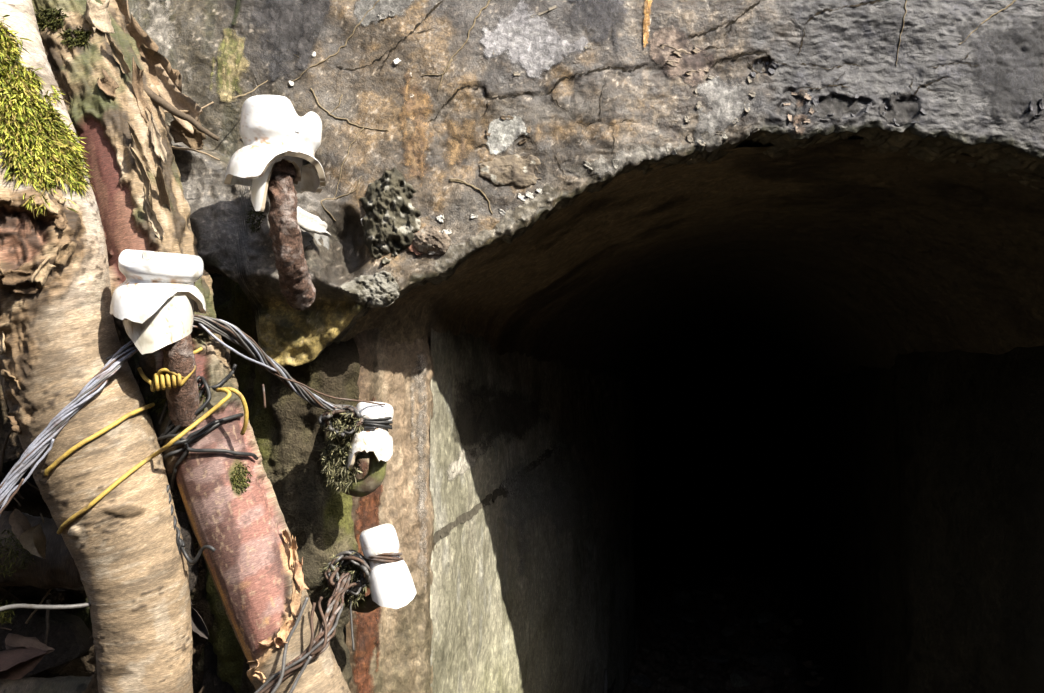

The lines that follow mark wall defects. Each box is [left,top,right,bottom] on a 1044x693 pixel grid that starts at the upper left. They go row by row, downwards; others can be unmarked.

crack [335,0,443,70]
peeling [480,0,593,78]
crack [428,64,647,155]
crack [514,134,567,178]